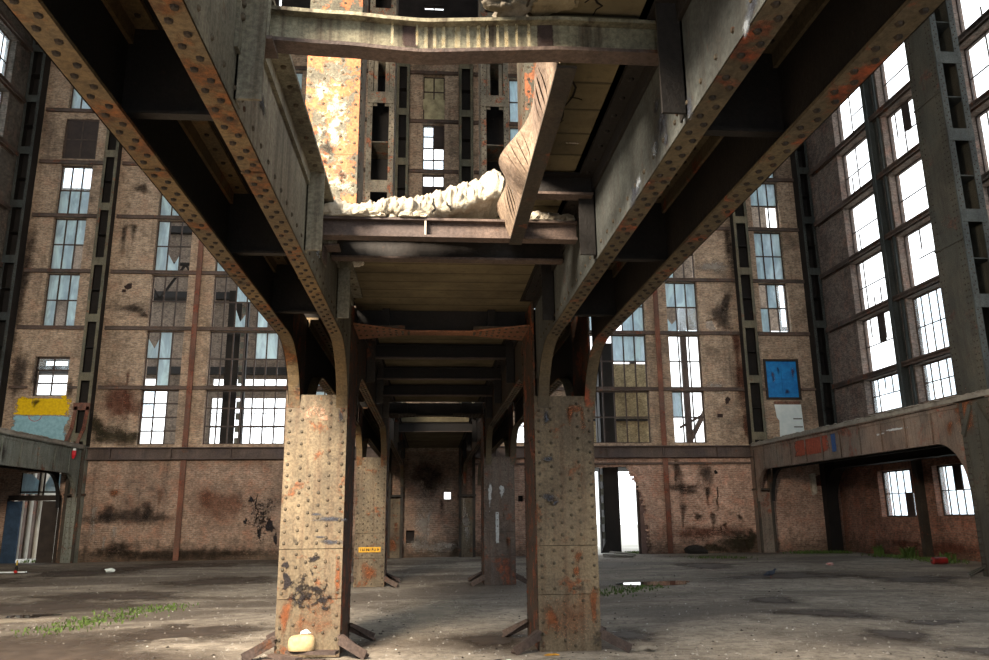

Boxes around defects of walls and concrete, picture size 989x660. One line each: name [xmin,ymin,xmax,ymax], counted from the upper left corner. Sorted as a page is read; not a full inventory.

spalling [481,0,579,17]
water stain [701,467,718,524]
peeling [281,555,340,610]